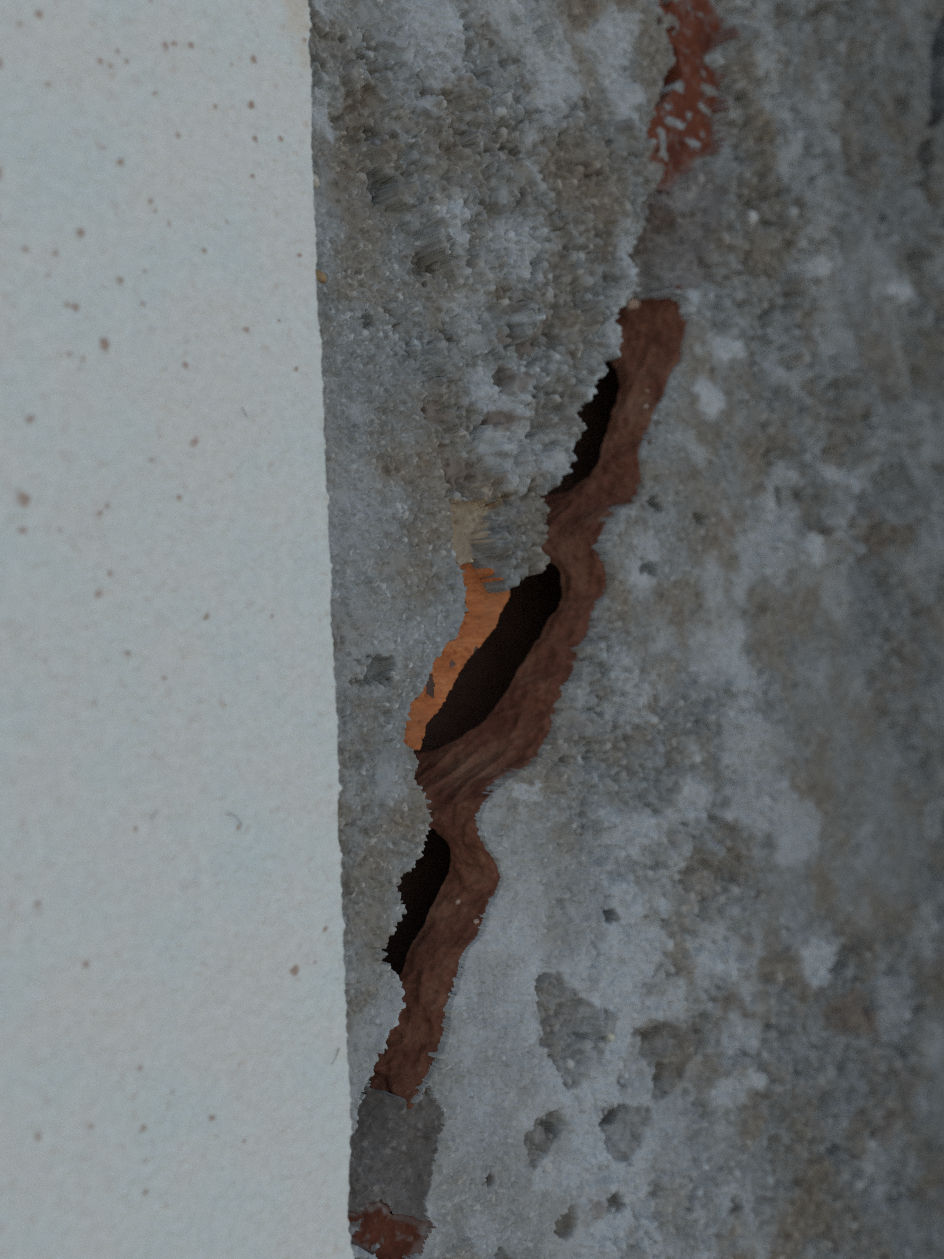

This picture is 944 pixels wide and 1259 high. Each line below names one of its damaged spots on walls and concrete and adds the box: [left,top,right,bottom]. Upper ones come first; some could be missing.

spalling [353,653,396,688]
spalling [380,282,577,751]
crack [347,0,742,1259]
peeling [534,971,621,1070]